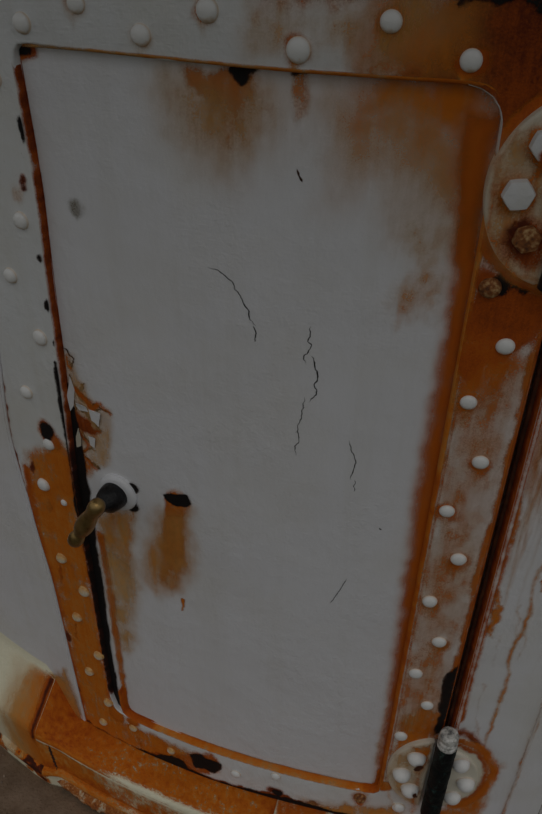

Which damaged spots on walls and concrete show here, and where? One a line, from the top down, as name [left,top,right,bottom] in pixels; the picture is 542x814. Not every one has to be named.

rust [19,43,37,60]
rust [506,129,542,195]
rust [490,182,542,273]
crack [208,267,257,341]
crack [294,328,319,453]
rust [3,62,400,814]
rust [391,329,542,814]